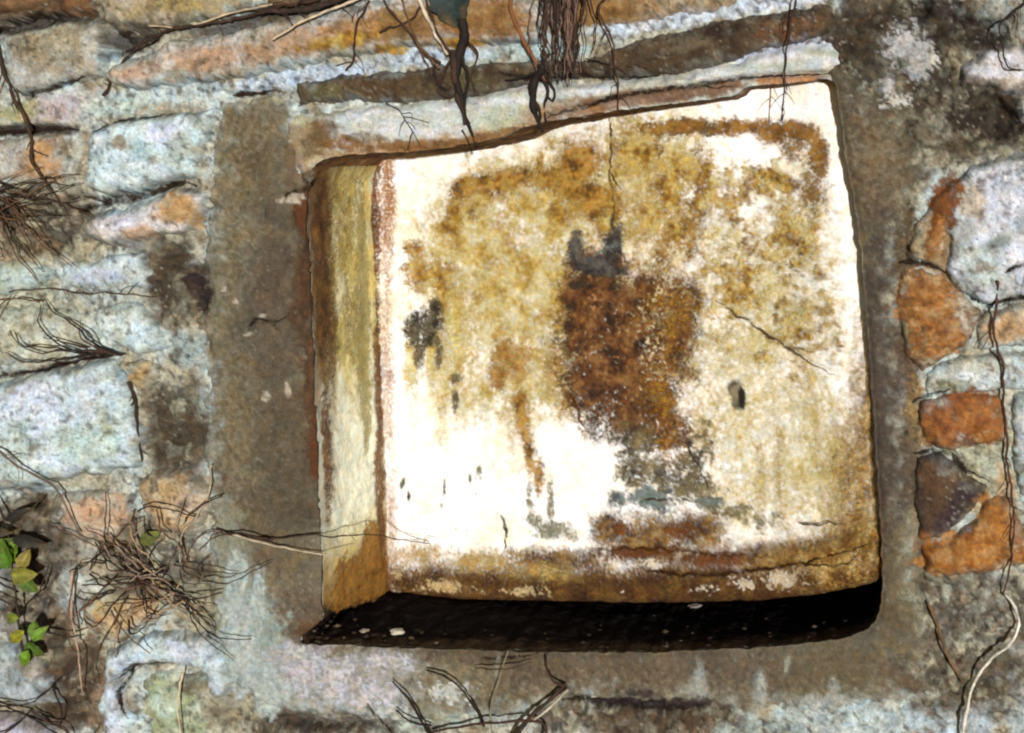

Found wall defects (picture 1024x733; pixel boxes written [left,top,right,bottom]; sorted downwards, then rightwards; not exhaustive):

crack [498,71,822,231]
damp [403,113,873,544]
crack [715,300,835,375]
crack [594,544,868,578]